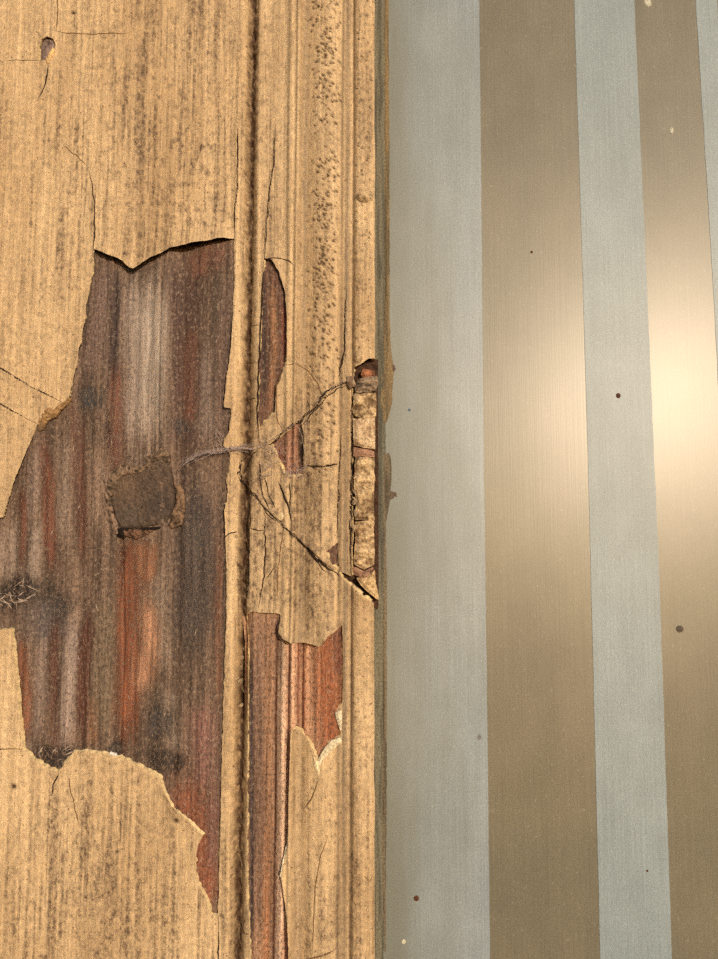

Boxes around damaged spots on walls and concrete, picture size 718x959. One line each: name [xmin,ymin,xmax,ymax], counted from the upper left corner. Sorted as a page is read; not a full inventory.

peeling [40,38,55,64]
crack [65,146,96,248]
crack [0,367,63,403]
crack [225,124,353,609]
peeling [347,369,379,600]
peeling [0,237,343,959]
crack [52,774,79,824]